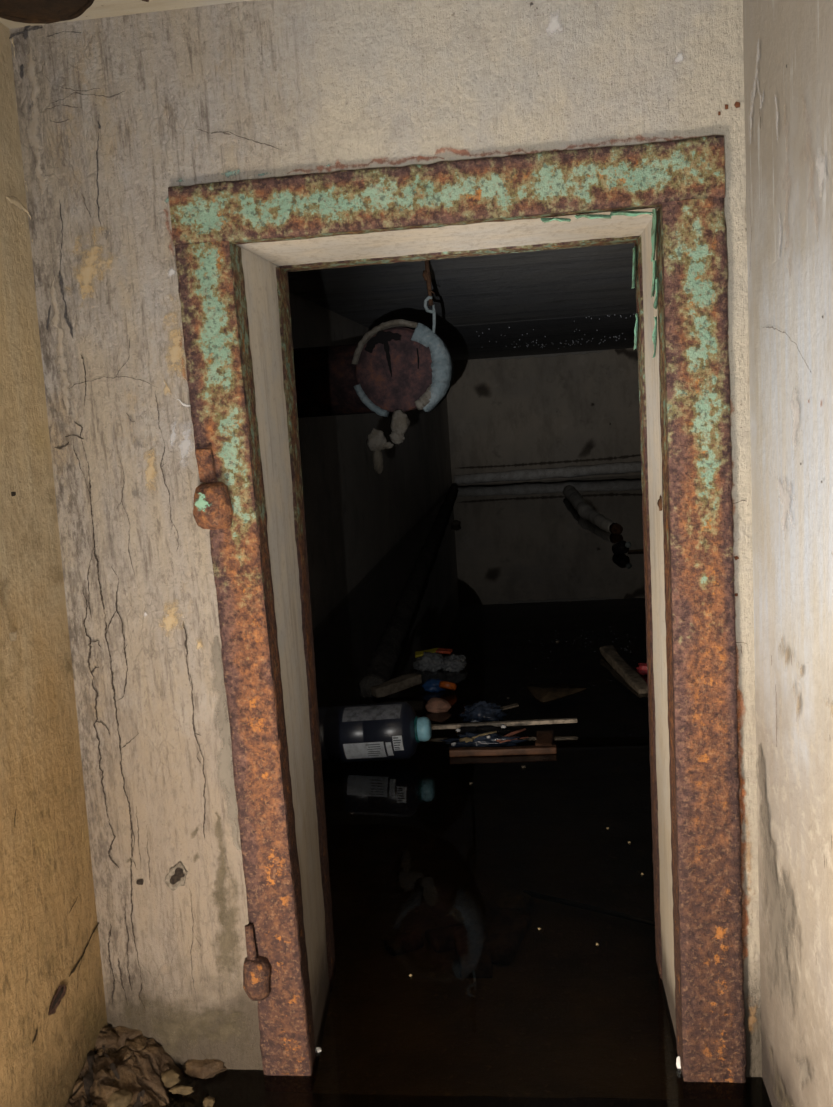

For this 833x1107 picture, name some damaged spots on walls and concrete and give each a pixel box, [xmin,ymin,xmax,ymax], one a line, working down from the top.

crack [9,25,81,79]
crack [197,129,278,149]
corrosion [287,148,538,174]
crack [46,86,178,1009]
crack [182,622,206,840]
corrosion [736,646,748,961]
crack [189,888,202,994]